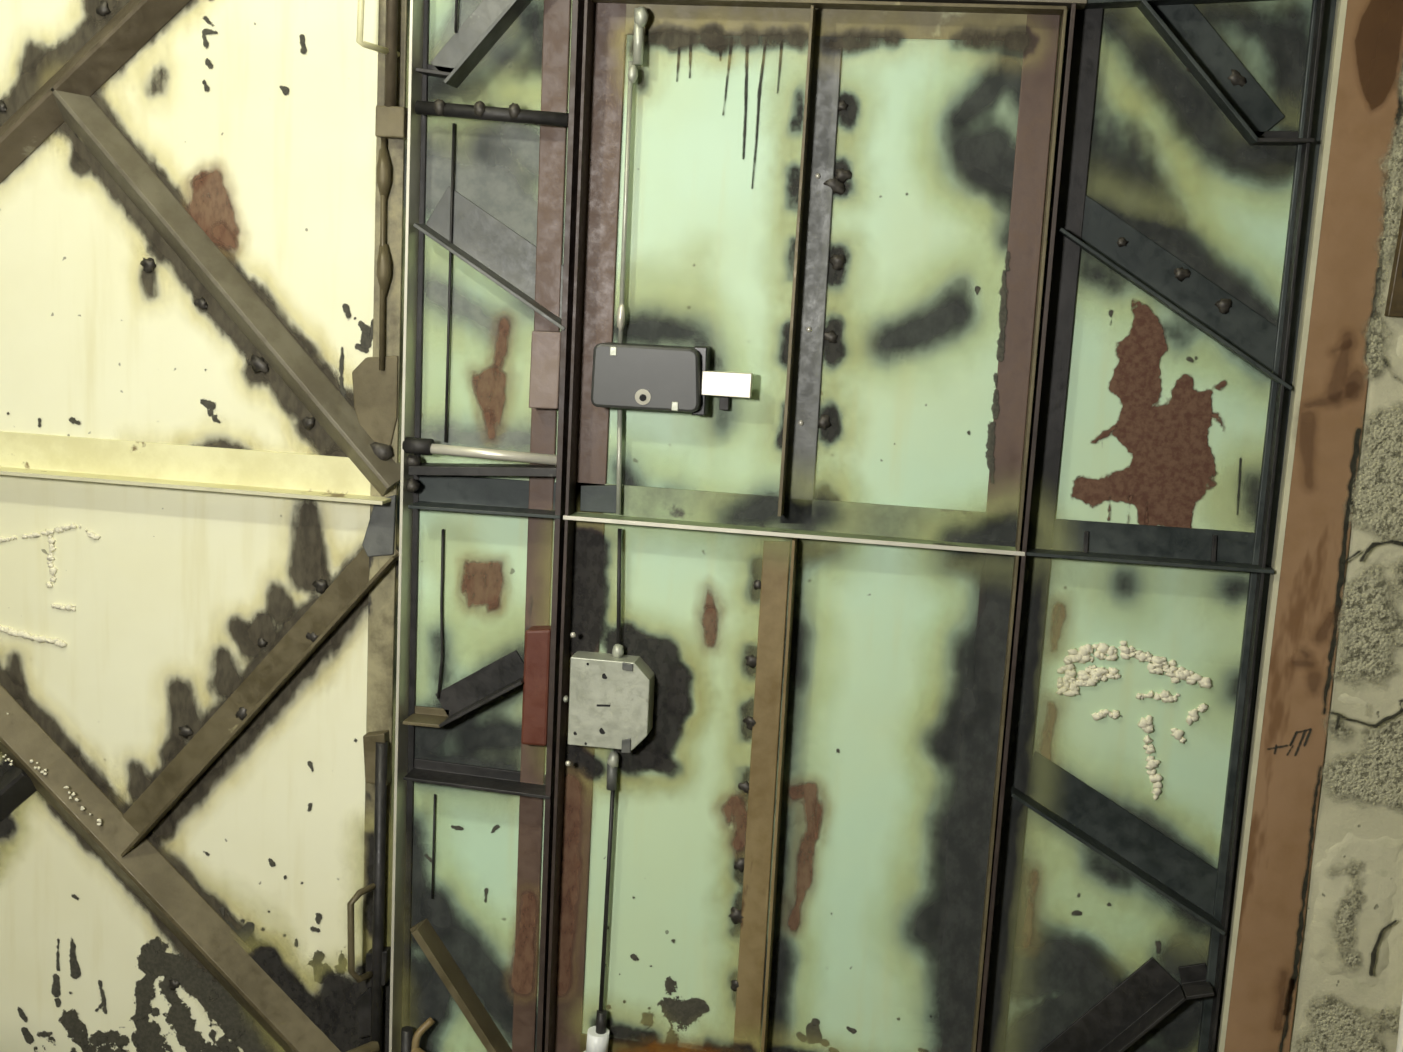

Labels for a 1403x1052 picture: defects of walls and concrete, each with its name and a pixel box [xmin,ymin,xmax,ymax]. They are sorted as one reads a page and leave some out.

rust [188,167,240,250]
rust [472,317,510,440]
rust [1071,300,1227,528]
rust [461,560,504,612]
peeling [17,936,272,1052]